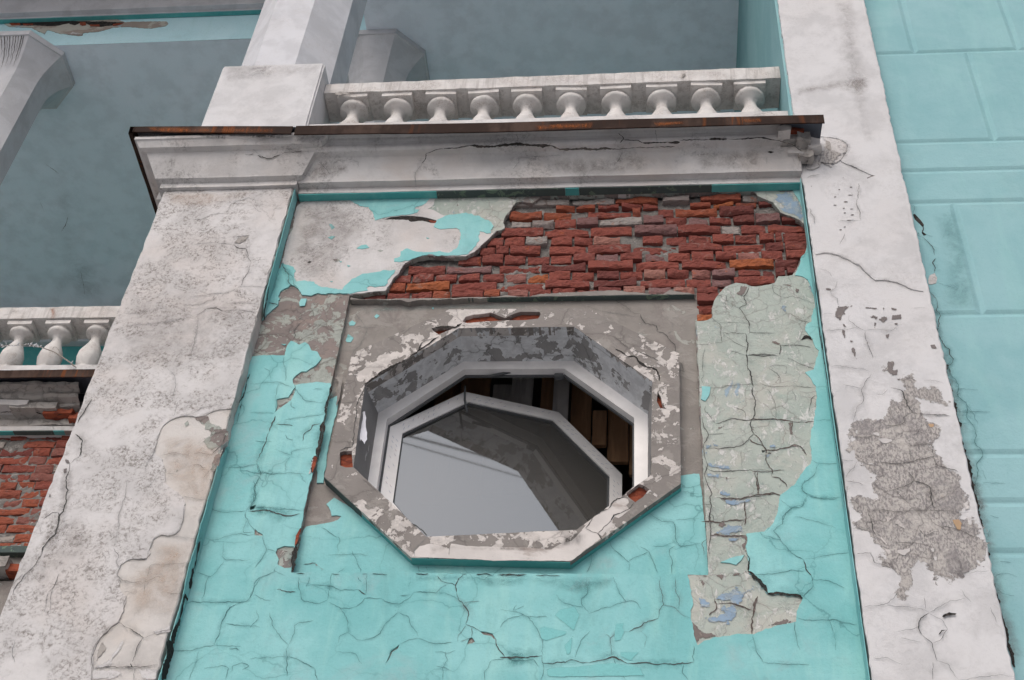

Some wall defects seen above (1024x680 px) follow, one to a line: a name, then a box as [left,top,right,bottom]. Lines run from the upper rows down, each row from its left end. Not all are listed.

flaking render [0,436,70,546]
crack [9,399,92,595]
peeling [262,191,819,645]
crack [91,134,1017,680]
peeling [835,305,856,357]
peeling [866,307,902,338]
flaking render [846,361,990,601]